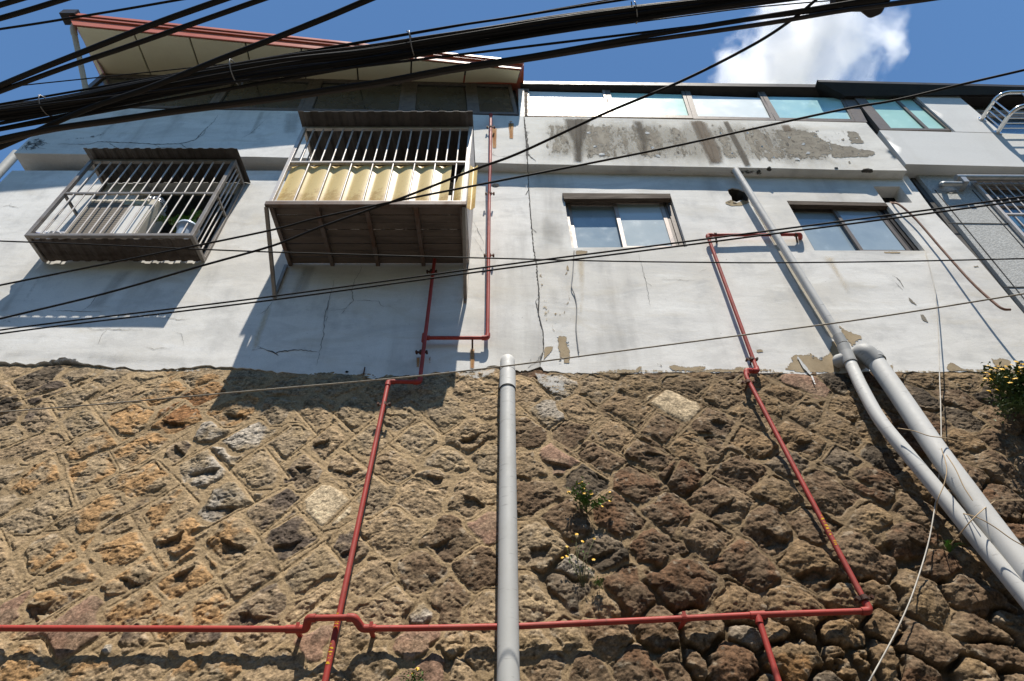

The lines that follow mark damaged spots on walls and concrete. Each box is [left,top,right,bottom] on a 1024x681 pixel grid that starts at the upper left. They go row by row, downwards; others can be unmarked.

leakage [635,121,660,154]
leakage [668,121,721,163]
leakage [724,121,811,175]
crack [523,118,544,368]
crack [259,270,382,363]
peeling [543,297,570,363]
peeling [592,200,862,373]